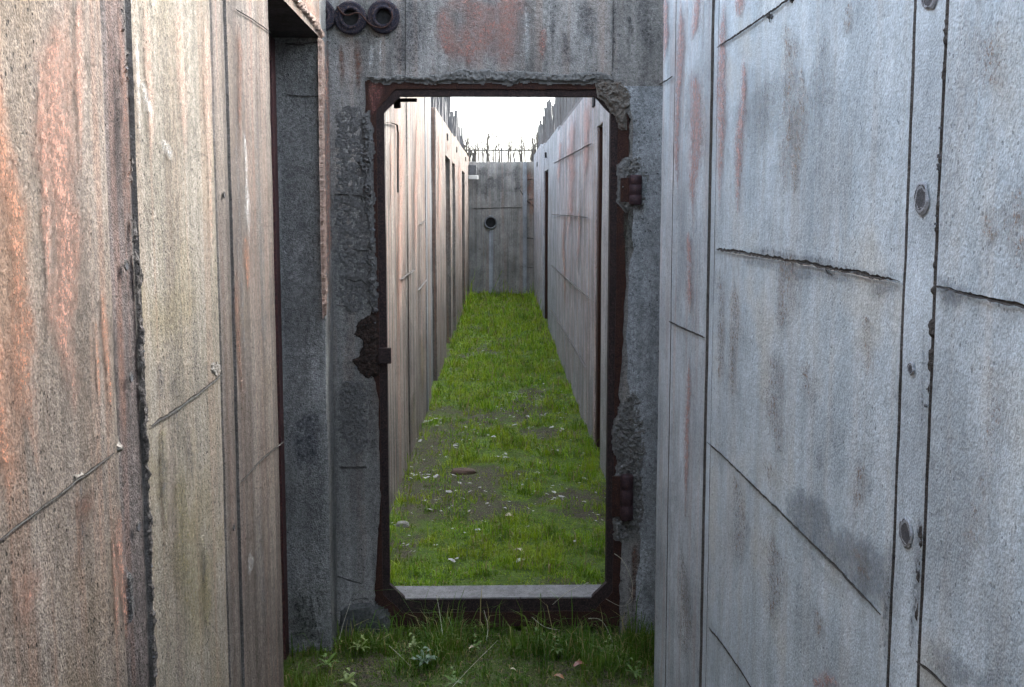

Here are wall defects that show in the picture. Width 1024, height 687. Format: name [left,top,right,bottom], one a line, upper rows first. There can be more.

rust [0,96,34,490]
rust [36,8,82,361]
rust [96,298,125,426]
rust [119,26,130,211]
spalling [352,110,380,379]
rust [391,123,419,317]
spalling [365,69,631,130]
rust [663,0,703,204]
rust [717,0,746,210]
crack [715,248,900,282]
crack [934,285,1024,309]
spalling [611,392,646,543]